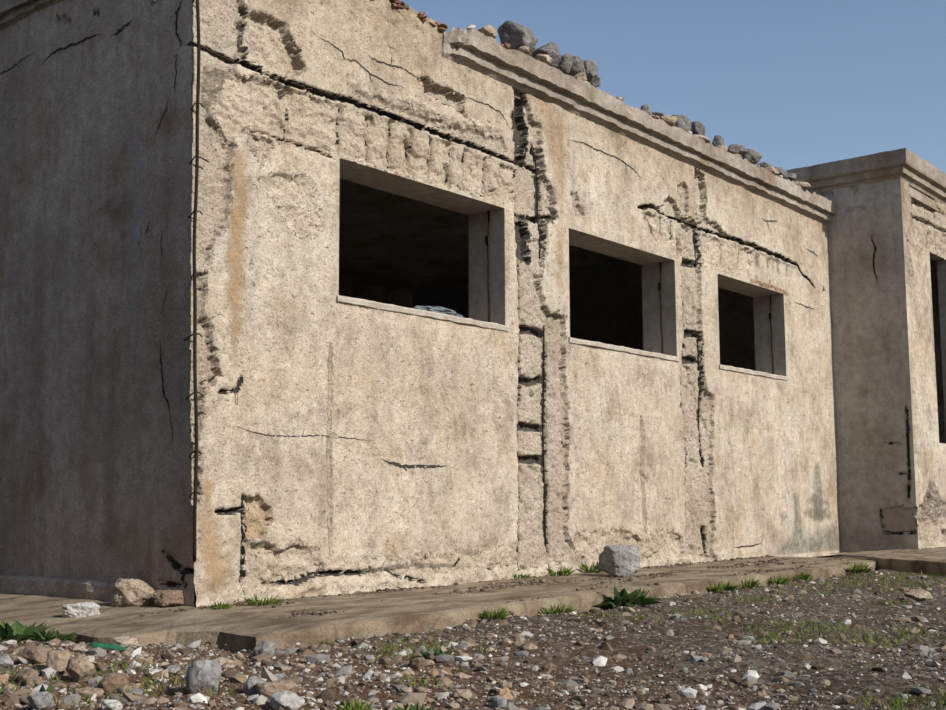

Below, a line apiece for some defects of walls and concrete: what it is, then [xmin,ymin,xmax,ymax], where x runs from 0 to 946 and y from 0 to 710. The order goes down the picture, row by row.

spalling [188,0,755,579]